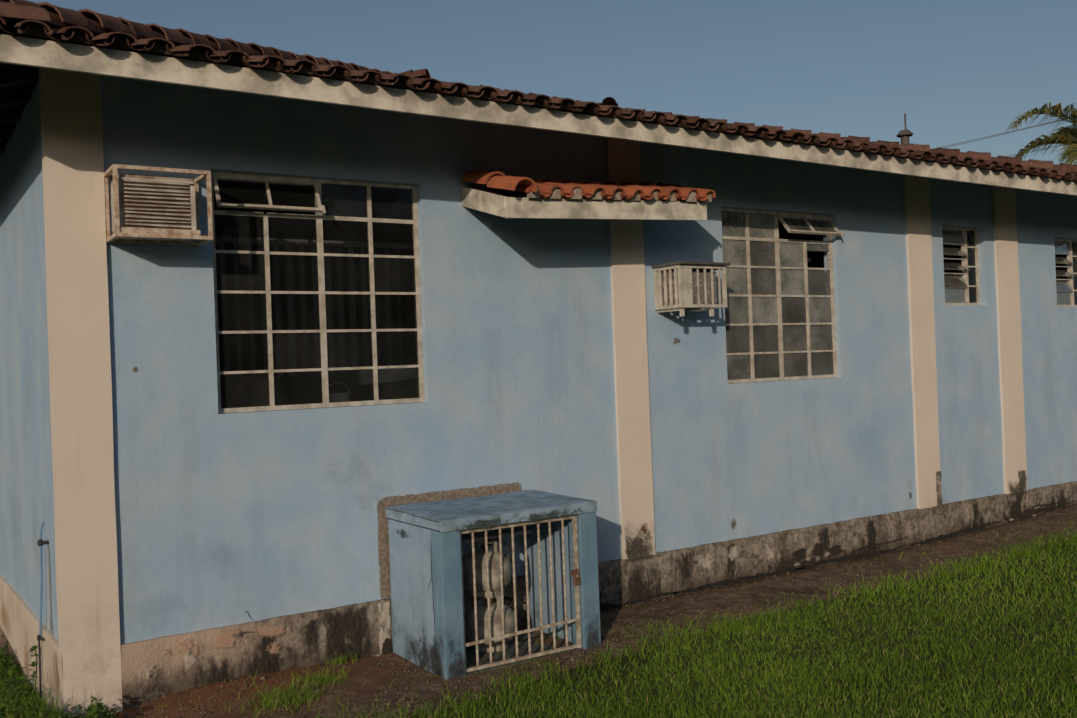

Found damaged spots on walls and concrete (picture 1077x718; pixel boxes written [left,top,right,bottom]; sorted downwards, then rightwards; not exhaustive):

damp [1004,471,1027,523]
damp [962,502,991,534]
damp [620,530,661,604]
damp [679,553,693,585]
damp [726,544,737,580]
damp [819,528,830,560]
damp [844,519,888,562]
damp [241,607,371,677]
damp [192,658,230,686]